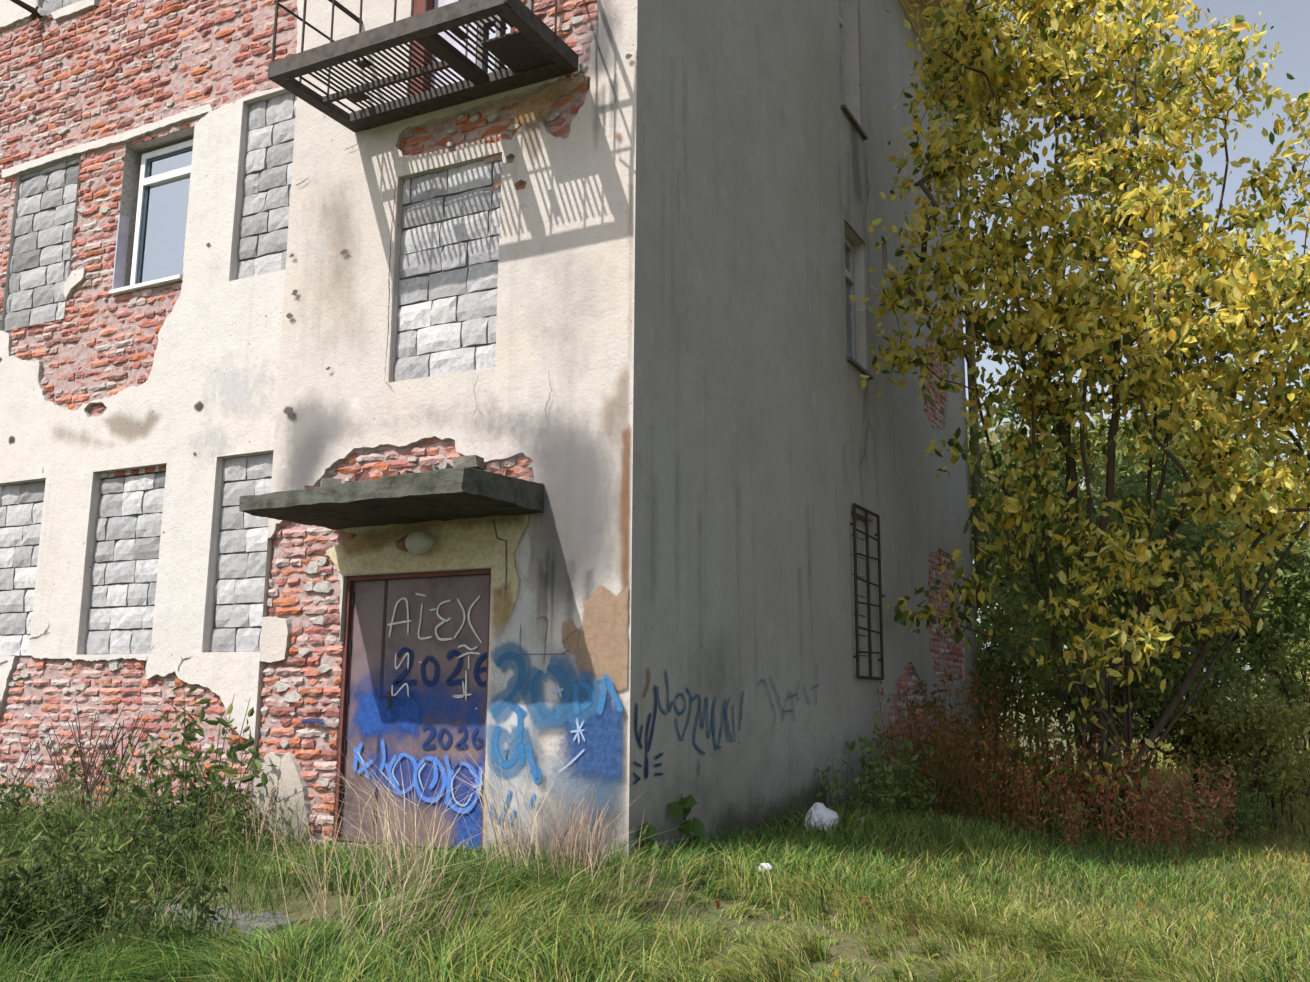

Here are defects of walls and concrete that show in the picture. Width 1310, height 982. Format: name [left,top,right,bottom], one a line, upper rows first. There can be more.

spalling [395,0,599,164]
spalling [0,0,299,417]
spalling [492,180,527,190]
spalling [313,436,465,486]
spalling [484,452,534,482]
spalling [0,514,528,842]
peeling [561,585,628,691]
spalling [877,548,965,798]